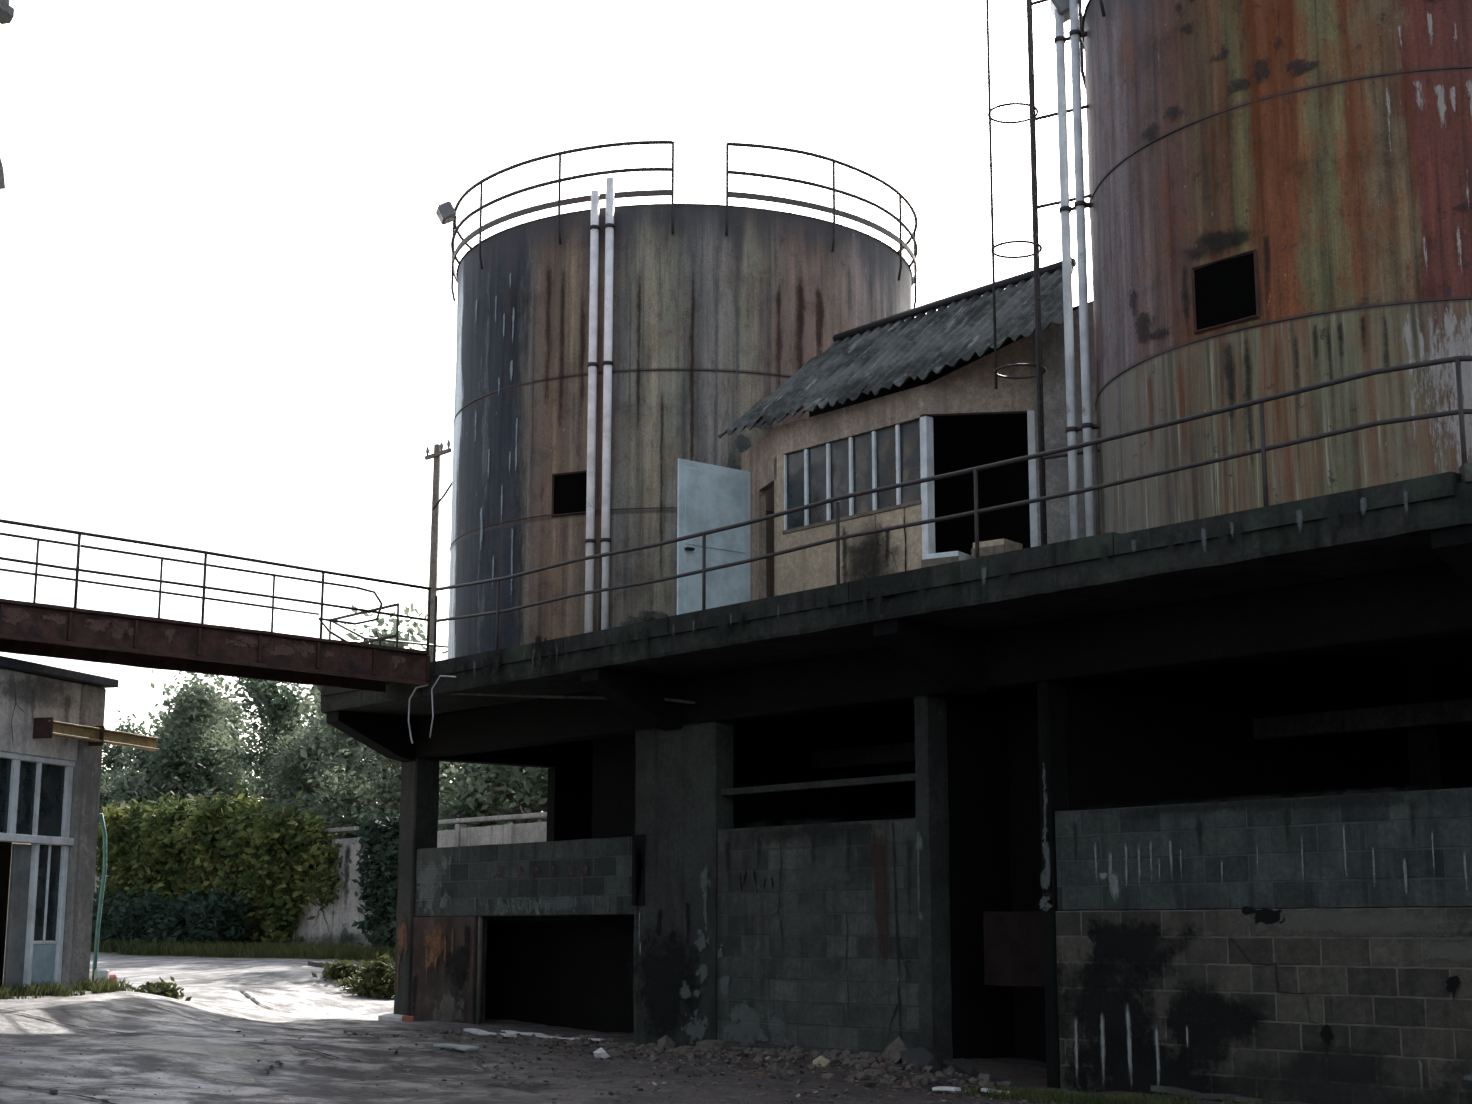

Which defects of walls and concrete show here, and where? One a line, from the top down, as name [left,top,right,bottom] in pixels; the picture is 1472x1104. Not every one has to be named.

corrosion [545,267,585,410]
water stain [715,246,739,432]
corrosion [777,284,824,385]
peeling [1402,310,1472,467]
corrosion [3,606,139,640]
corrosion [225,635,335,659]
water stain [1073,825,1182,897]
water stain [1135,788,1435,876]
corrosion [397,920,454,990]